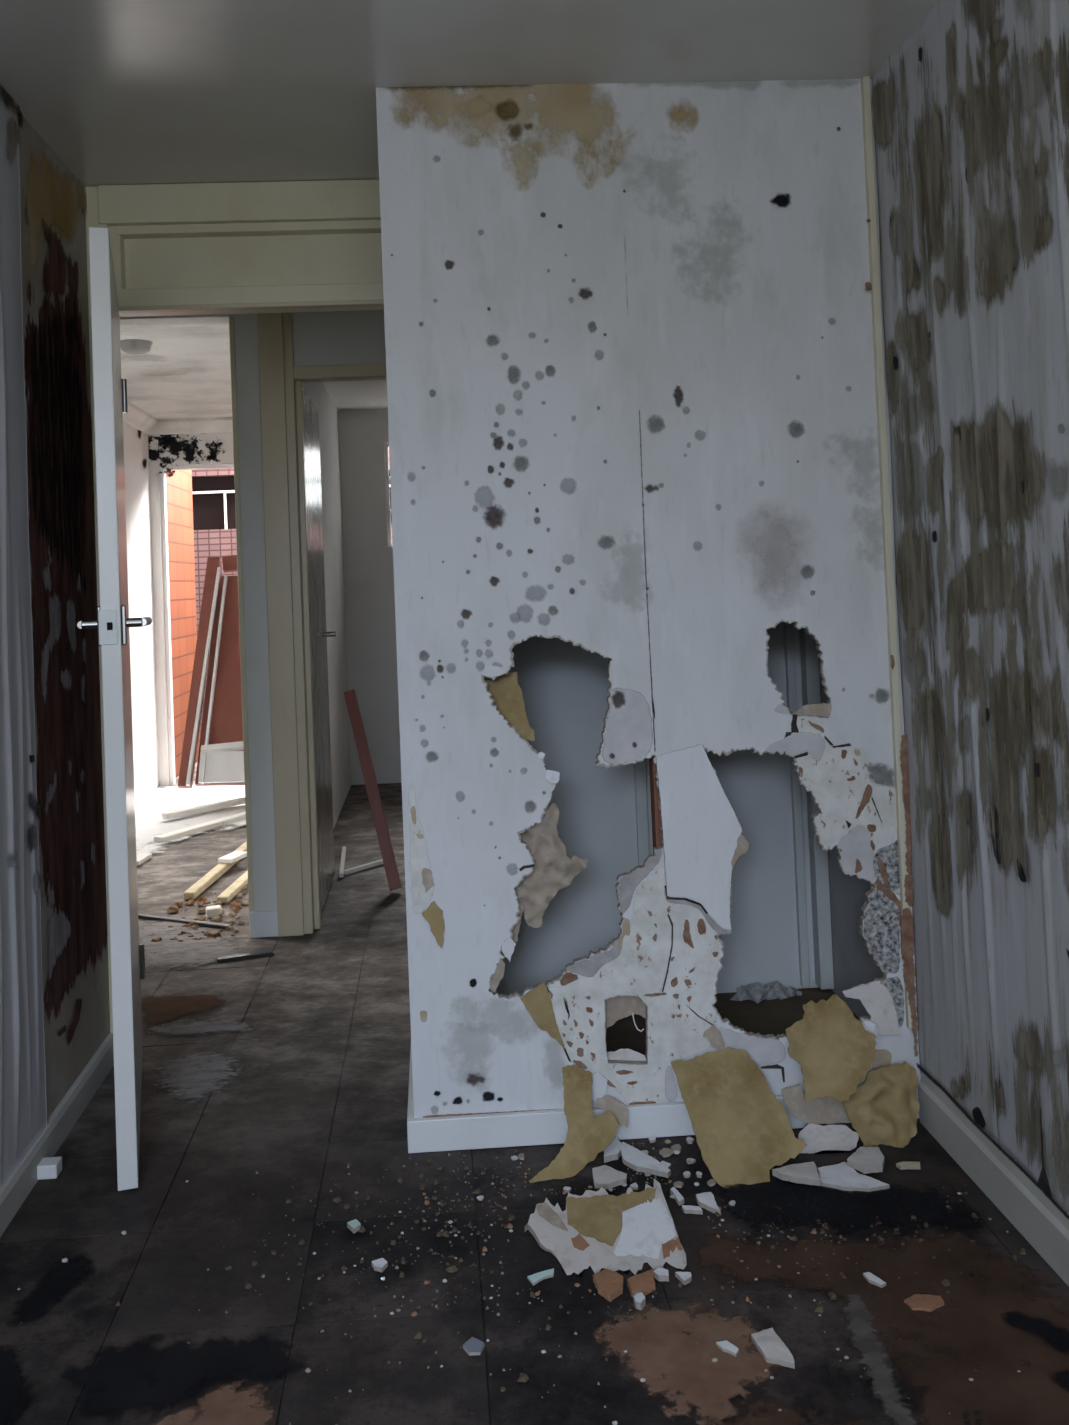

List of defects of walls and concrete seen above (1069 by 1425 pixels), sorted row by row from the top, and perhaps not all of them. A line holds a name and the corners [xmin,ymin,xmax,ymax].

leakage [389,84,621,184]
leakage [771,194,790,207]
leakage [674,386,683,407]
leakage [488,422,528,488]
leakage [872,0,1069,916]
mould [466,506,504,574]
peeling [731,835,750,868]
peeling [765,716,909,1028]
peeling [520,853,786,1105]
leakage [951,1020,1069,1196]
spalling [630,1136,716,1190]
leakage [62,1334,305,1417]